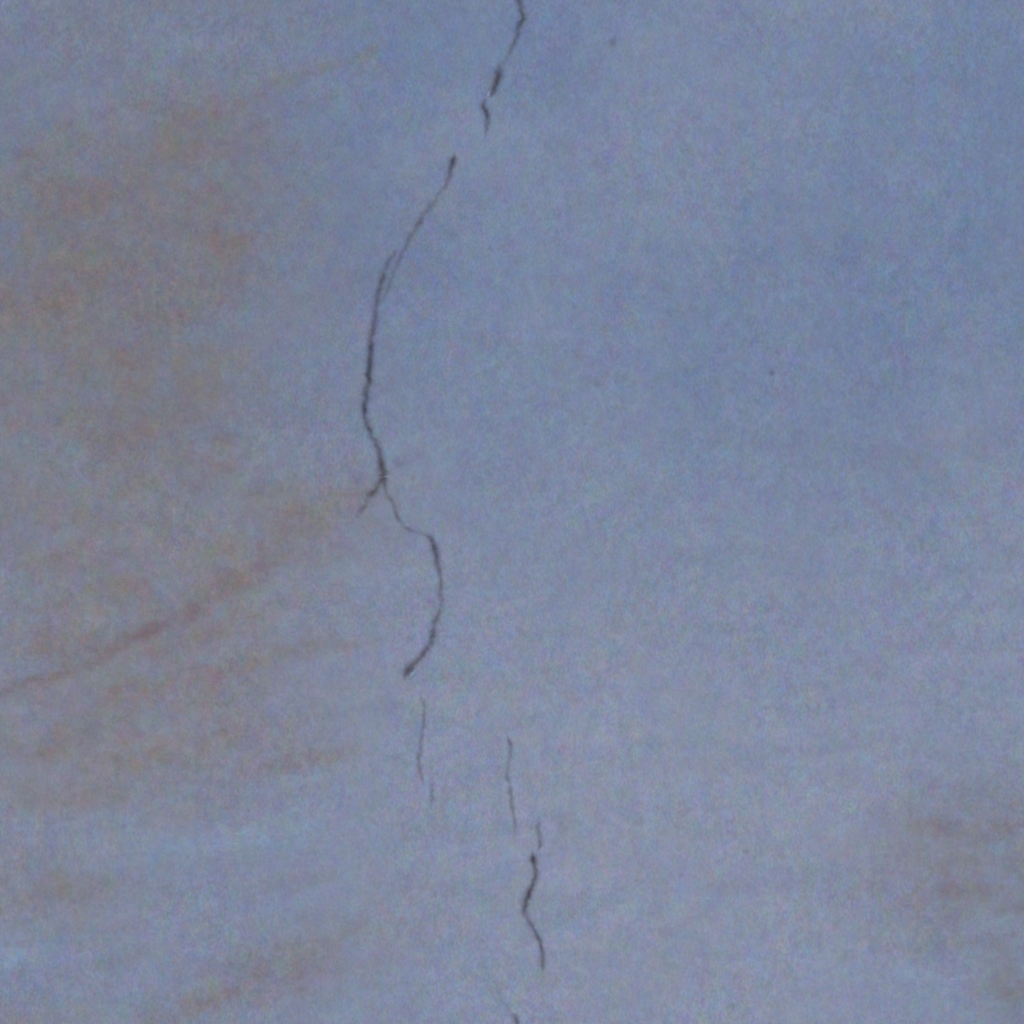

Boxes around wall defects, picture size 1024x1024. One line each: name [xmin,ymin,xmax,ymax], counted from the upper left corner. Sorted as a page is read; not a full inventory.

crack [483,72,500,113]
crack [365,345,373,382]
crack [527,852,540,899]